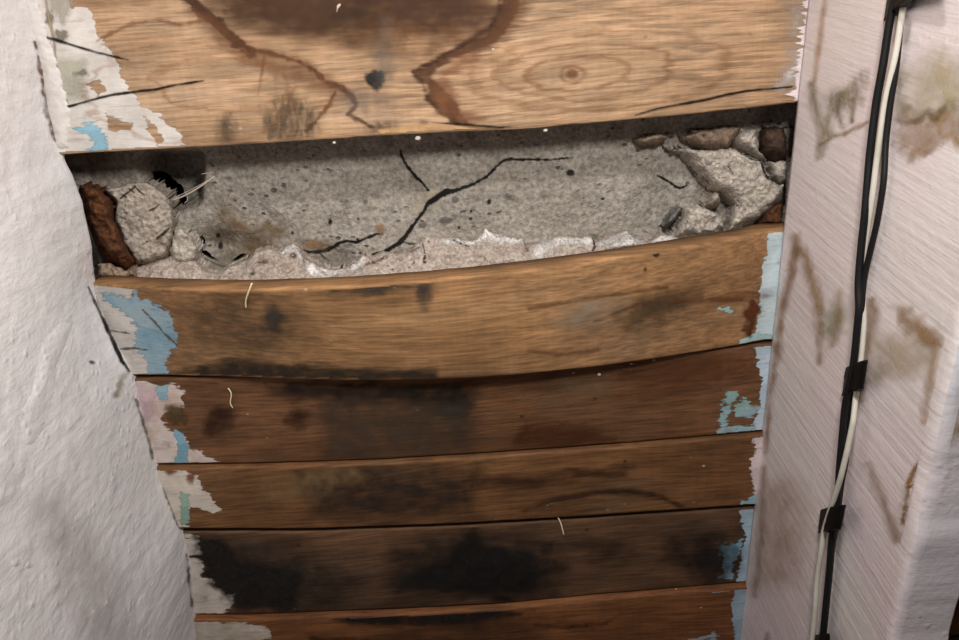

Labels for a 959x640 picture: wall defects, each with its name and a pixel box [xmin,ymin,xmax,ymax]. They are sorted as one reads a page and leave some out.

peeling [37,0,185,152]
crack [34,36,204,141]
damp [185,0,524,138]
spalling [135,189,681,280]
crack [290,122,572,265]
damp [774,238,838,355]
peeling [94,286,271,640]
damp [188,360,471,452]
peeling [696,232,783,640]
damp [194,535,324,612]
damp [336,527,565,631]
peeling [688,631,719,640]